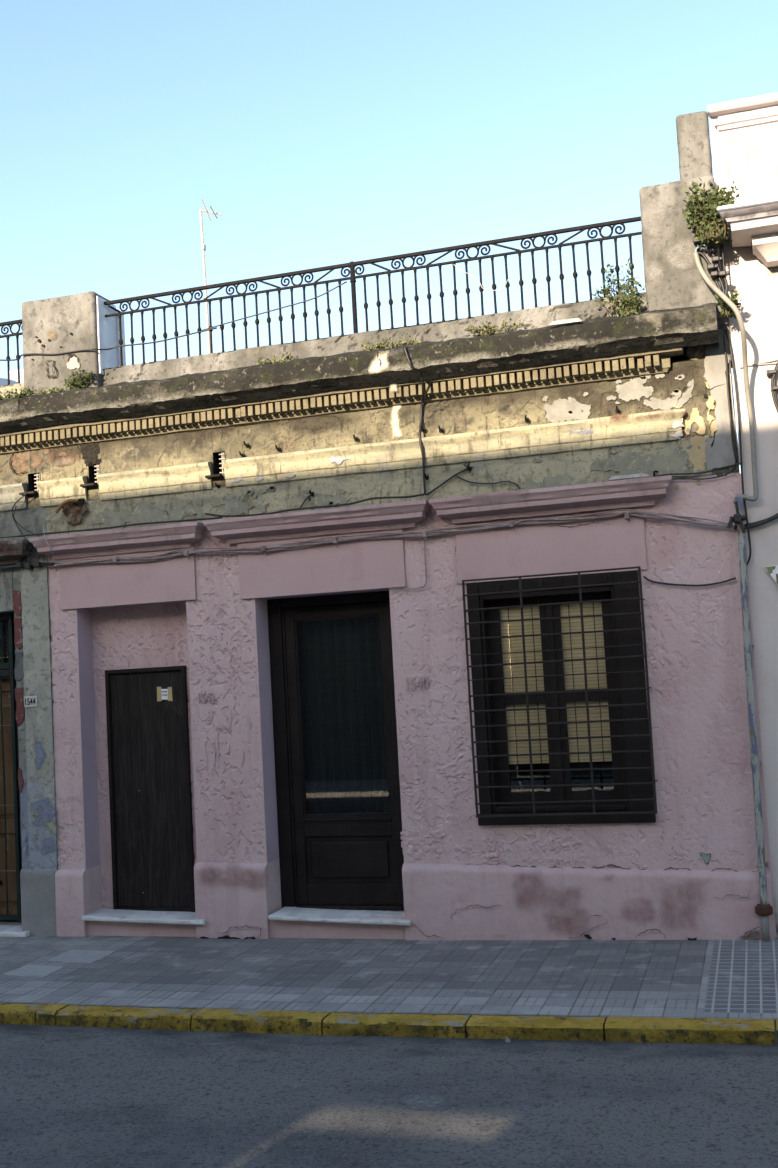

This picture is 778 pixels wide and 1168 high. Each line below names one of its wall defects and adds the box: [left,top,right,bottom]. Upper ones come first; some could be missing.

peeling [524,373,718,490]